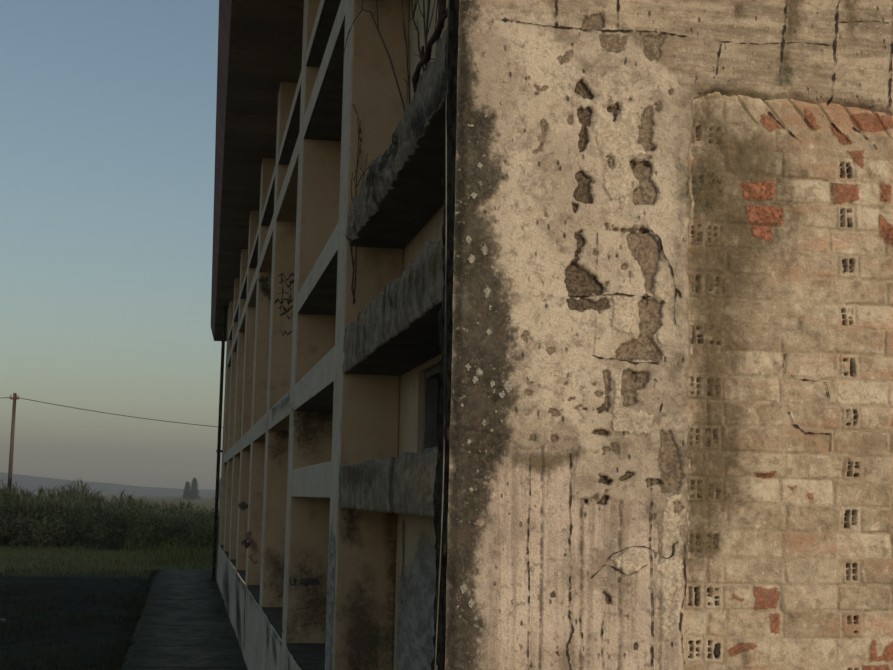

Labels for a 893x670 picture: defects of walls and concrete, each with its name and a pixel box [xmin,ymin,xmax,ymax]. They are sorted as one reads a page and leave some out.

crack [496,0,688,37]
crack [717,0,893,150]
flaking render [567,79,662,213]
flaking render [831,125,864,169]
flaking render [831,183,860,204]
flaking render [880,184,892,202]
flaking render [879,215,893,245]
damp [410,0,580,670]
crack [567,453,687,670]
damp [222,569,258,650]
flaking render [754,586,780,633]
flaking render [864,640,893,670]